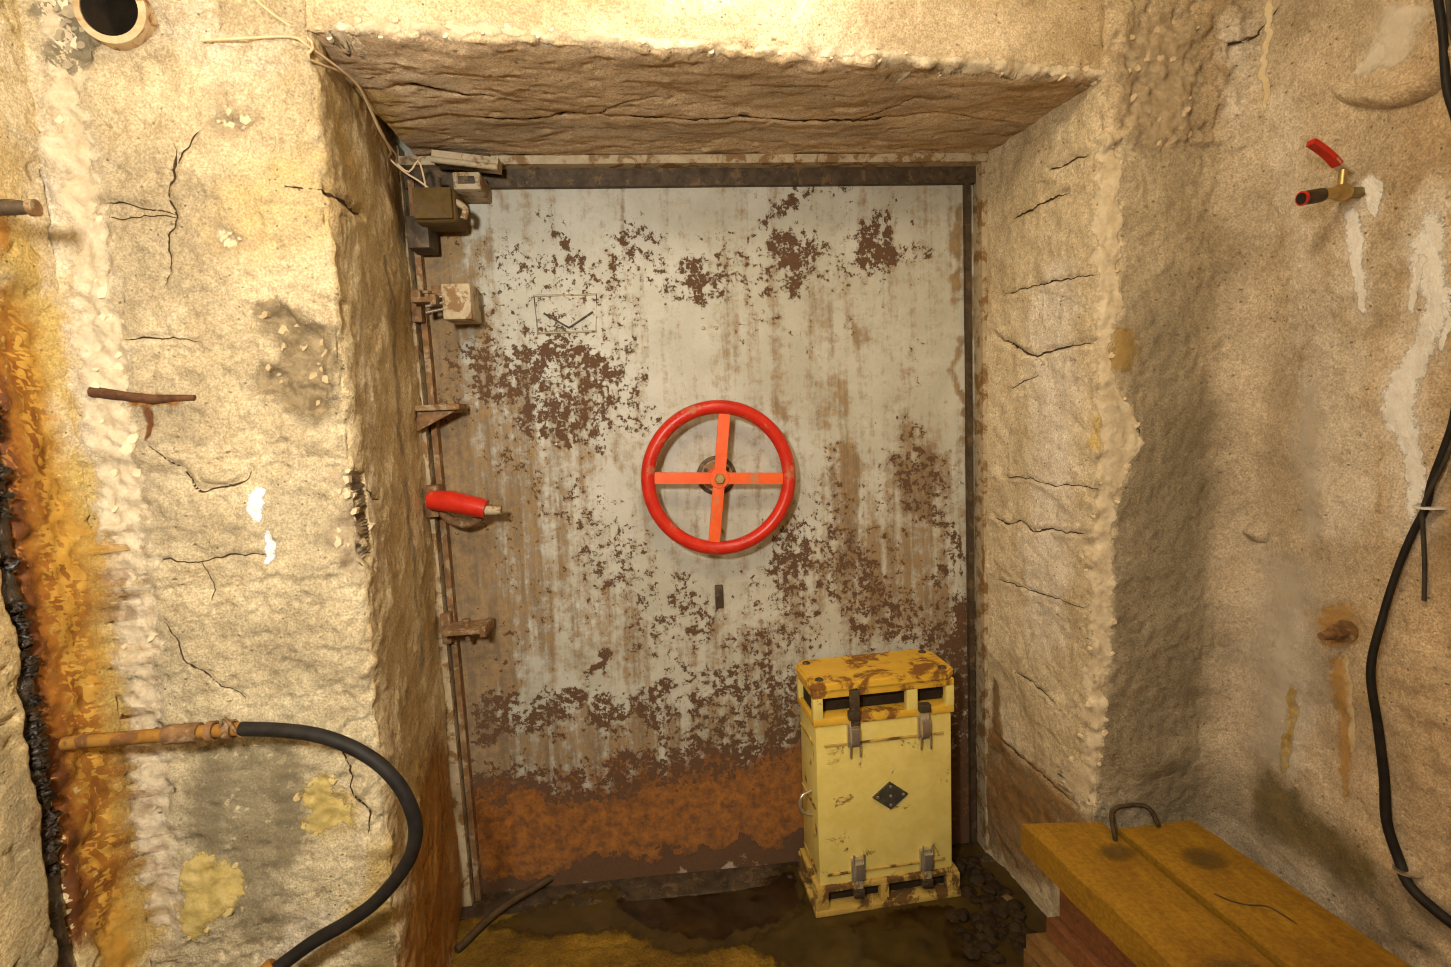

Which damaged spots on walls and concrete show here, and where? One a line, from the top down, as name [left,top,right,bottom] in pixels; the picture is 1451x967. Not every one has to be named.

damp [1342,174,1384,314]
peeling [325,11,1204,807]
damp [1379,205,1451,521]
rust [1317,604,1357,797]
rust [396,732,462,967]